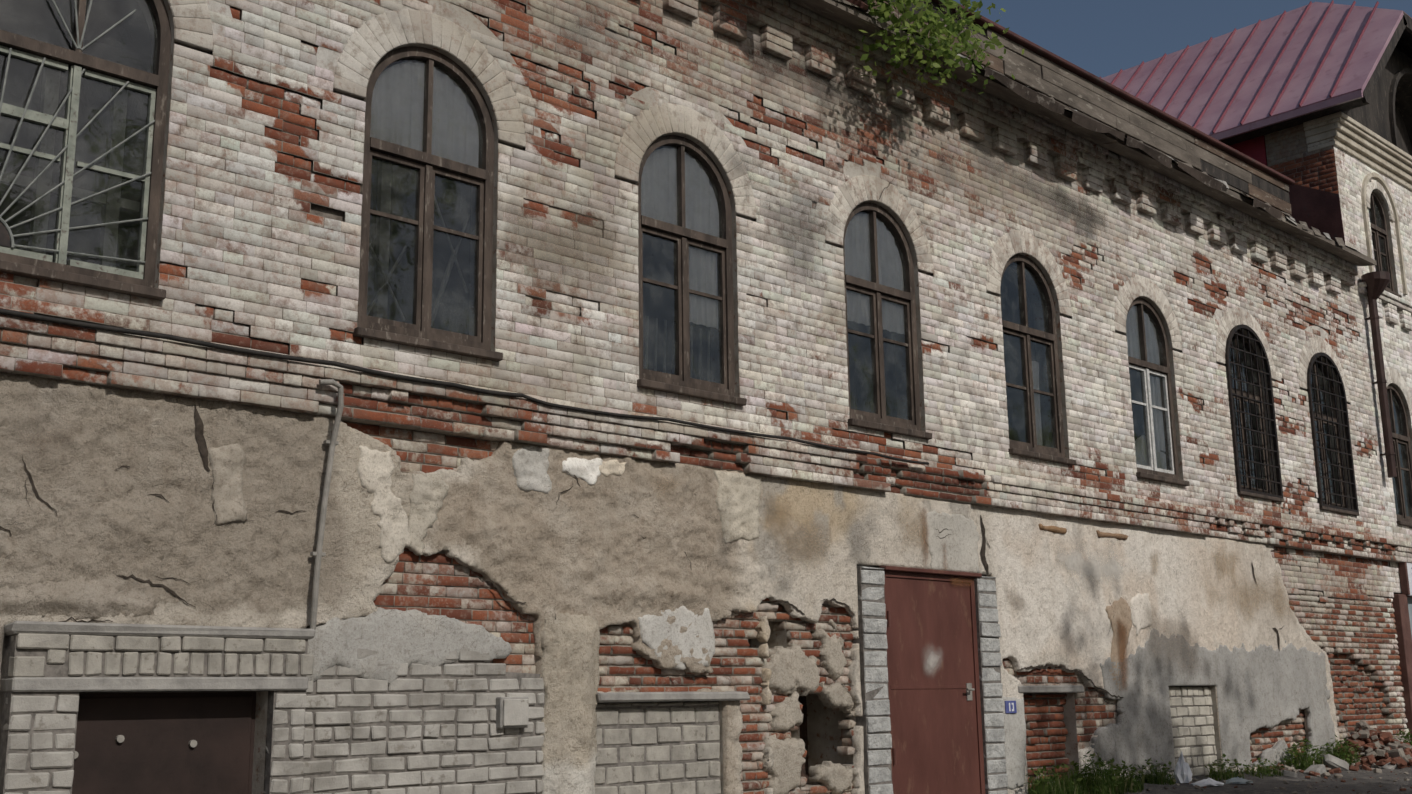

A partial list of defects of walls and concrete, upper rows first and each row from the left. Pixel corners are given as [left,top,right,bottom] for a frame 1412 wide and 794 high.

crack [0,456,57,536]
crack [113,571,216,611]
crack [194,405,306,526]
spalling [313,383,536,674]
crack [980,514,990,576]
peeling [1209,478,1395,572]
spalling [597,598,856,794]
spalling [1002,593,1152,750]
spalling [1250,709,1306,763]
spalling [1288,589,1408,746]